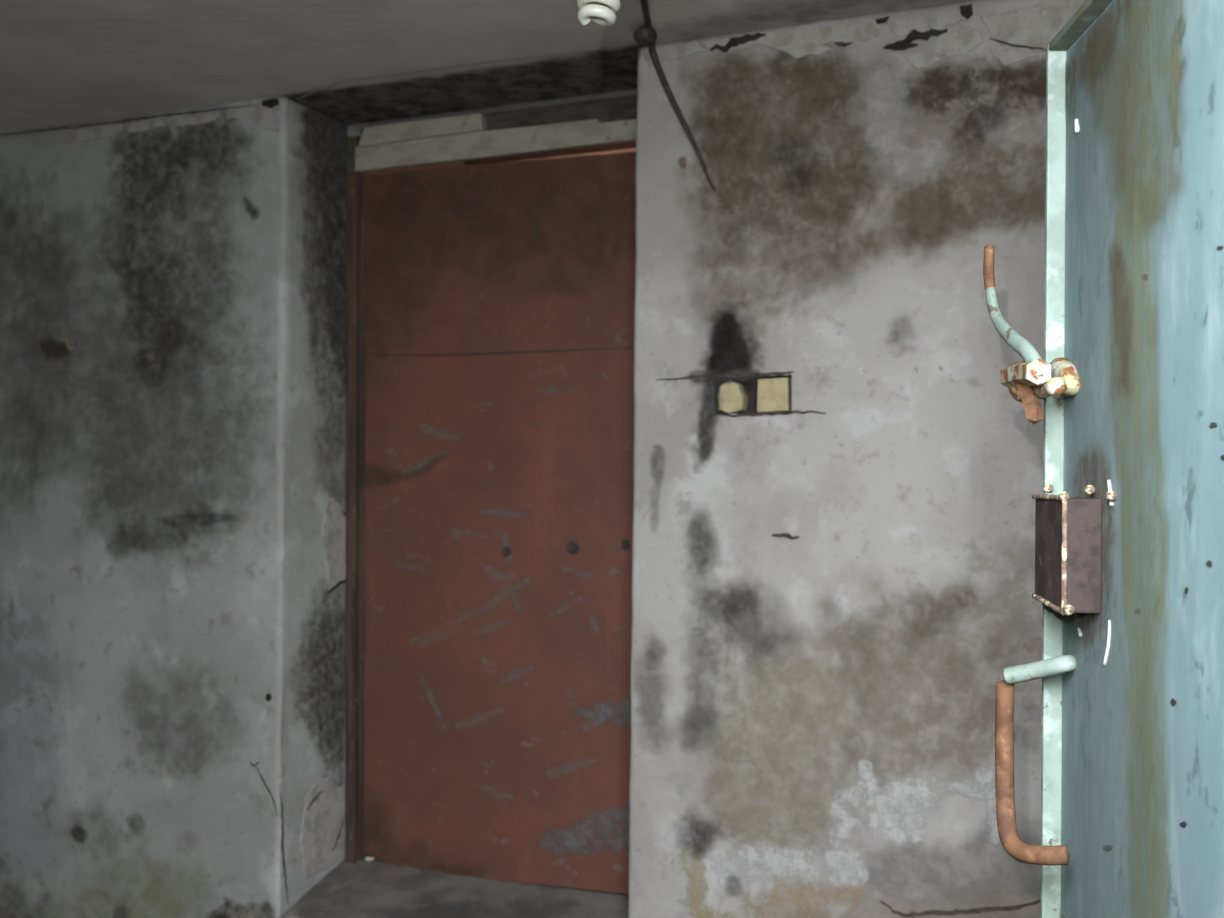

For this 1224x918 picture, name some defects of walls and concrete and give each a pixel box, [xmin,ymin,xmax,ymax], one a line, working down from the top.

flaking render [641,0,1086,69]
water stain [865,64,1046,176]
crack [657,373,713,381]
water stain [690,314,752,457]
water stain [711,760,1000,907]
spalling [209,899,297,918]
crack [880,900,1040,918]